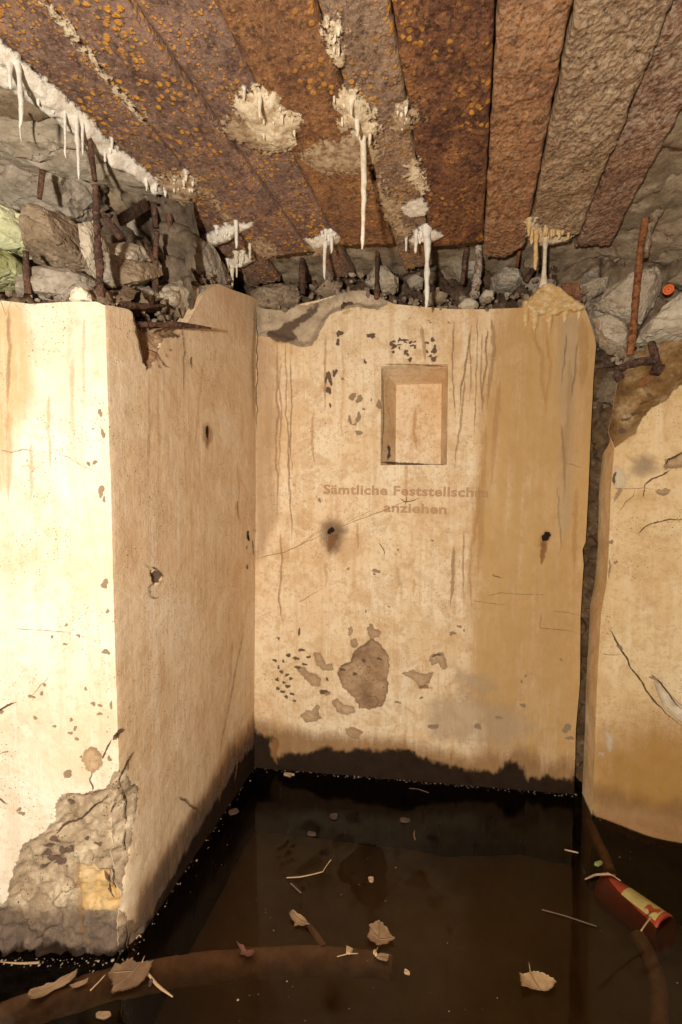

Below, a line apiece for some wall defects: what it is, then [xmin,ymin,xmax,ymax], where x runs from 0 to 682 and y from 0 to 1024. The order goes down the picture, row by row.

water stain [38,0,151,125]
spalling [87,138,105,298]
water stain [0,39,281,289]
spalling [119,201,211,369]
spalling [256,250,387,347]
water stain [215,82,444,309]
spalling [389,337,437,362]
water stain [0,214,596,1003]
crack [605,630,678,723]
spalling [0,718,138,964]
water stain [590,731,682,926]
water stain [43,990,170,1024]